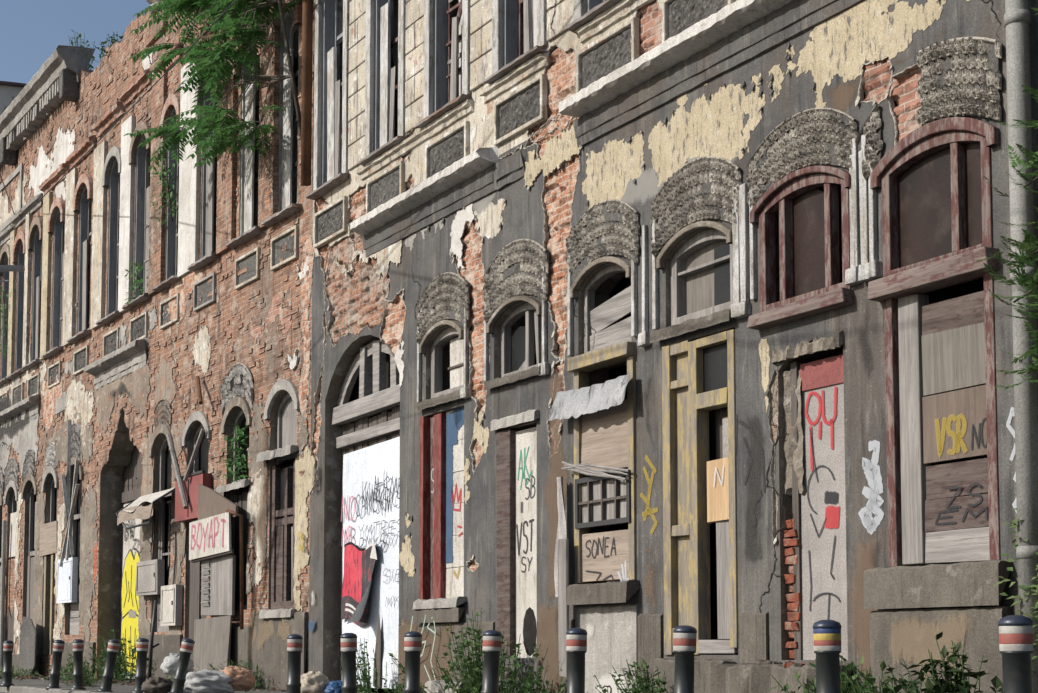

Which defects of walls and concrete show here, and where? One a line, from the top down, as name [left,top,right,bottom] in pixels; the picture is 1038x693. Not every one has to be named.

flaking render [0,127,76,262]
spalling [246,183,507,612]
peeling [499,0,947,459]
spalling [759,339,806,552]